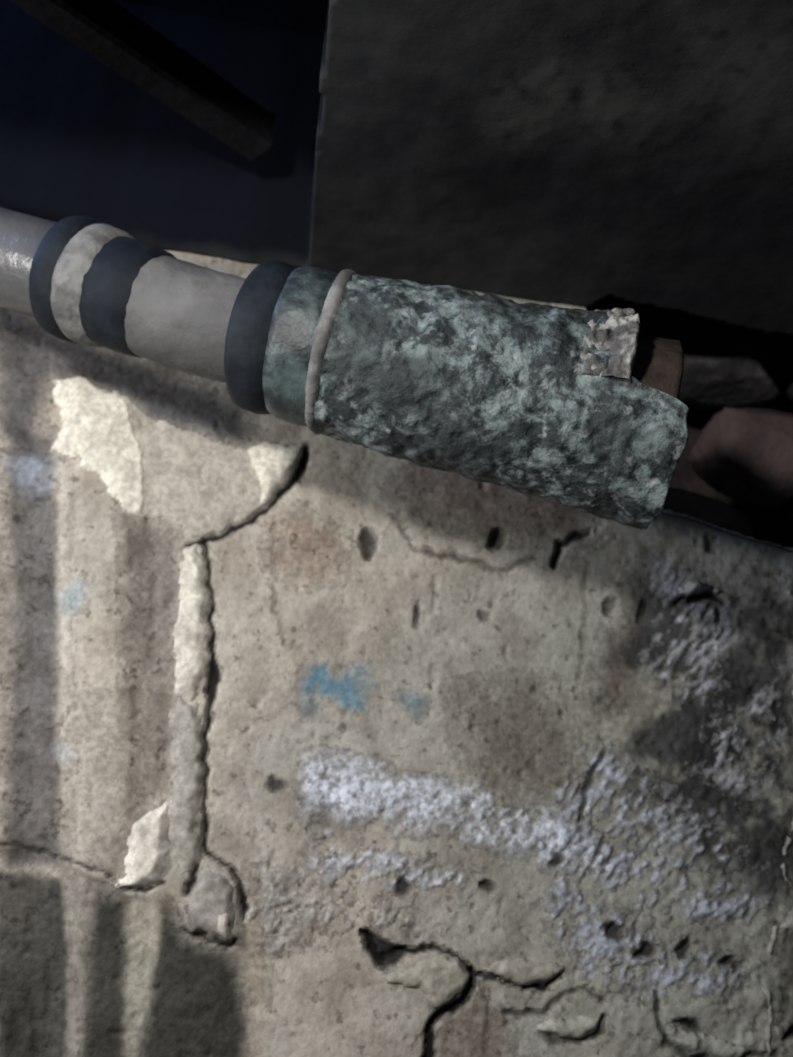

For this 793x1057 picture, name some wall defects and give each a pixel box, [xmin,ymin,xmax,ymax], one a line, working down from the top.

crack [673,587,728,606]
crack [0,441,311,951]
water stain [0,307,793,1057]
crack [358,928,610,1057]
crack [652,989,793,1057]